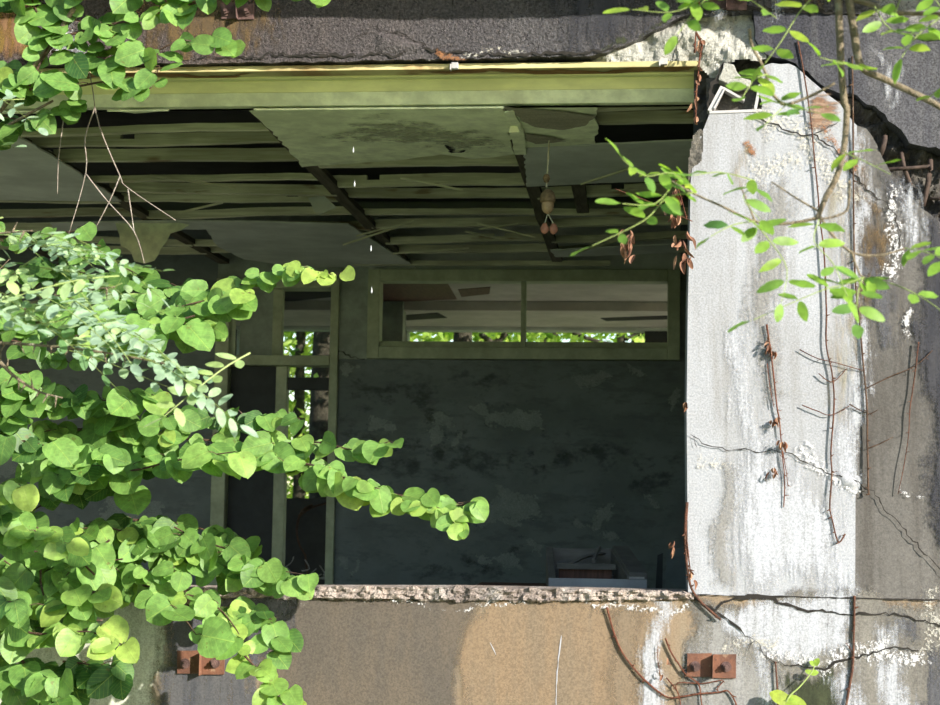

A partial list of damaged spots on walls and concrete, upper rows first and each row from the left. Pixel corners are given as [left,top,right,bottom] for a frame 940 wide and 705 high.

corrosion [0,5,34,58]
spalling [688,129,703,183]
spalling [834,97,940,220]
leakage [586,106,940,705]
crack [690,434,940,569]
crack [694,594,940,671]